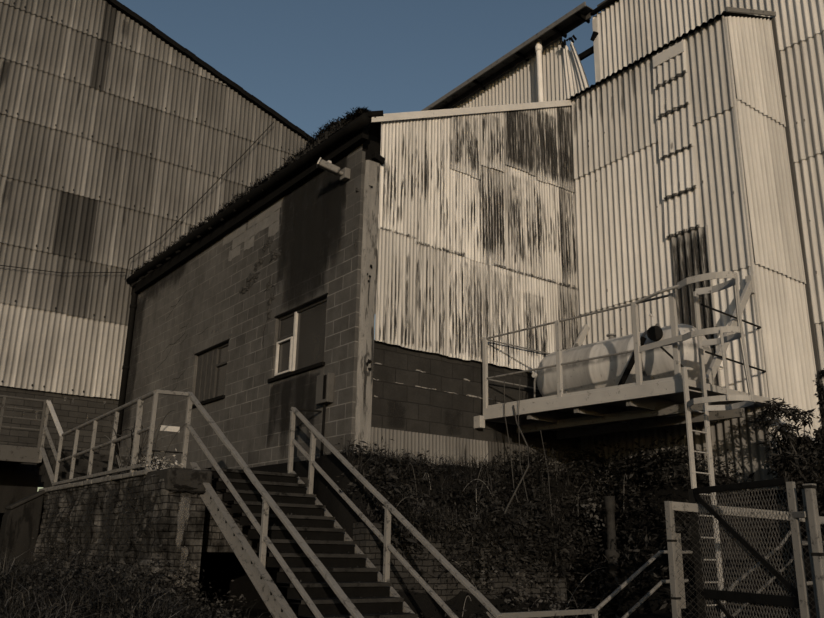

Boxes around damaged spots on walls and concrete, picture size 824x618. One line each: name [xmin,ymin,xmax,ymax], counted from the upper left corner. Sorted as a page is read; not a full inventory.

water stain [278,155,346,305]